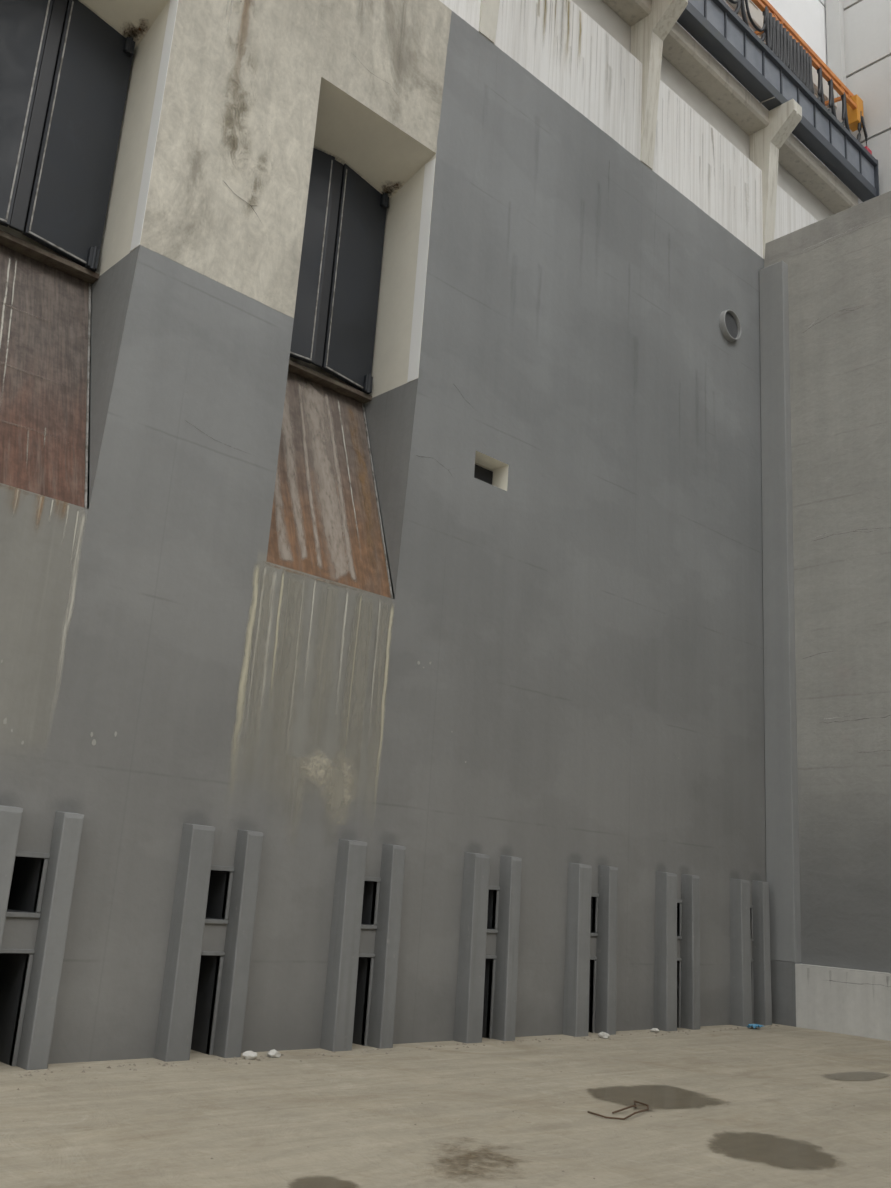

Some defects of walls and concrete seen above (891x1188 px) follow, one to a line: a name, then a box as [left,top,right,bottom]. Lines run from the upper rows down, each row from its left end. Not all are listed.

water stain [234,382,394,765]